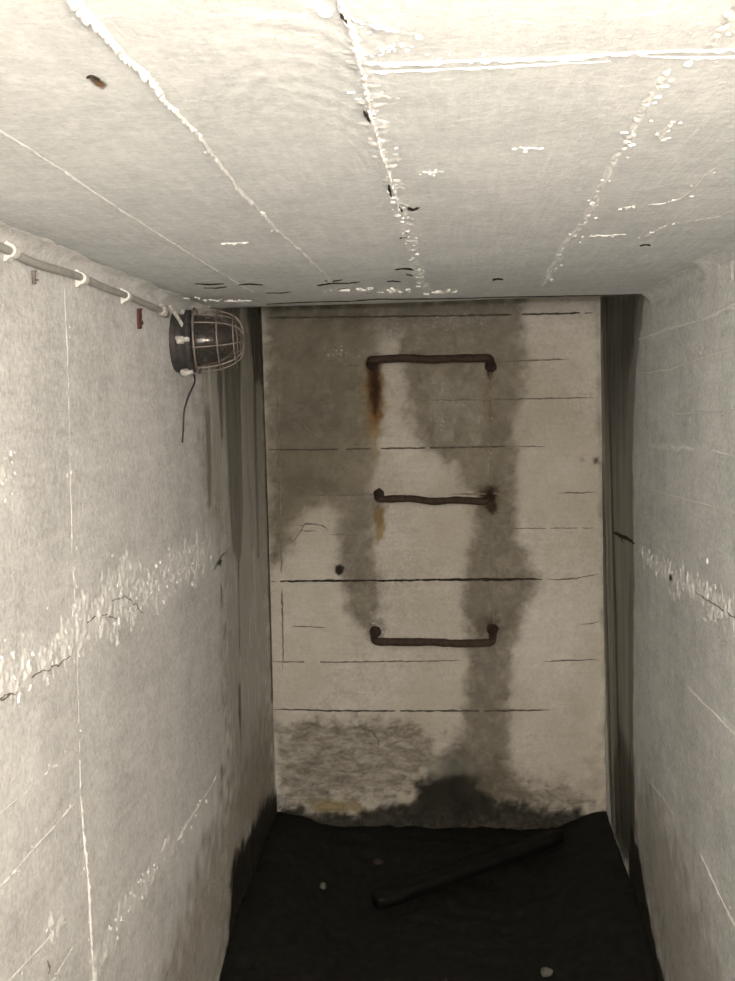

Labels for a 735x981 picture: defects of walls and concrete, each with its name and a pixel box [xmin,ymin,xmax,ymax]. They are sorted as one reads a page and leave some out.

rust [86,75,106,89]
rust [365,363,381,438]
leakage [247,299,532,807]